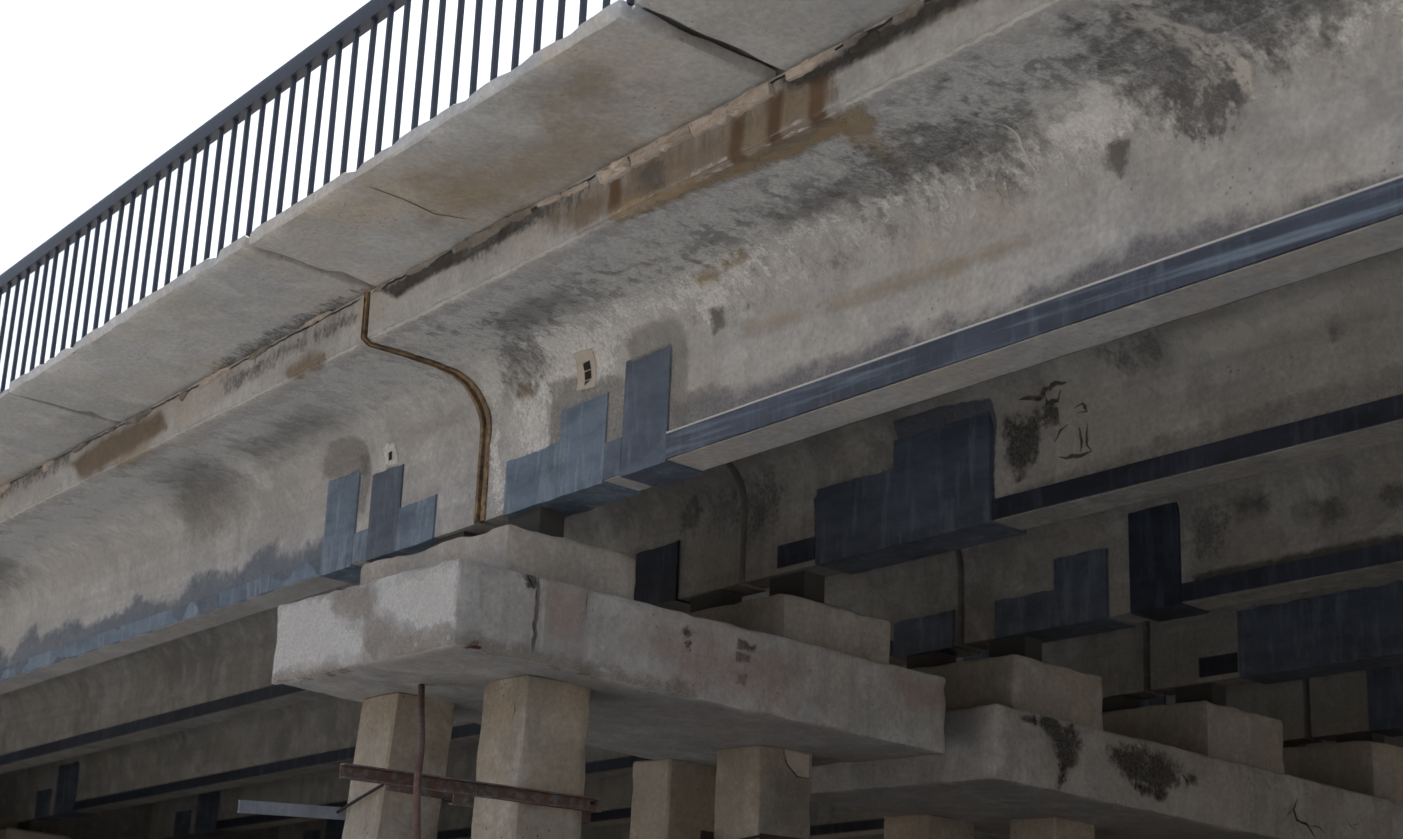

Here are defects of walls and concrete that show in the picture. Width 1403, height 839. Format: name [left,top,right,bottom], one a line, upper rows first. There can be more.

rust [554,74,875,226]
water stain [0,0,1403,591]
water stain [272,596,363,674]
water stain [377,561,465,630]
crack [527,574,540,652]
crack [1289,799,1356,838]